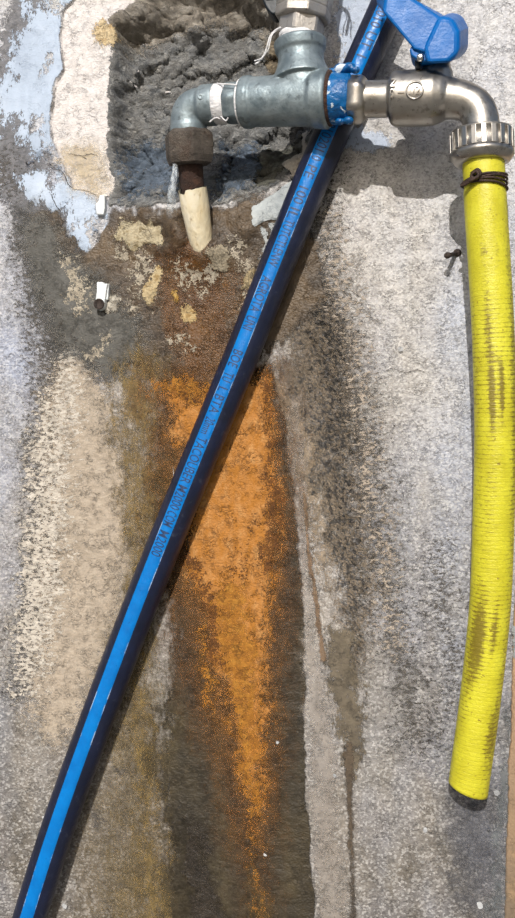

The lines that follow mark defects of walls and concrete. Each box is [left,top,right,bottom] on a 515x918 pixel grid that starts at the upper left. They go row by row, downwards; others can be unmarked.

leakage [0,0,49,91]
spalling [0,0,279,252]
flaking render [205,244,232,272]
flaking render [241,269,255,289]
spalling [203,124,314,259]
leakage [0,102,276,754]
rust [147,373,209,509]
rust [170,370,294,918]